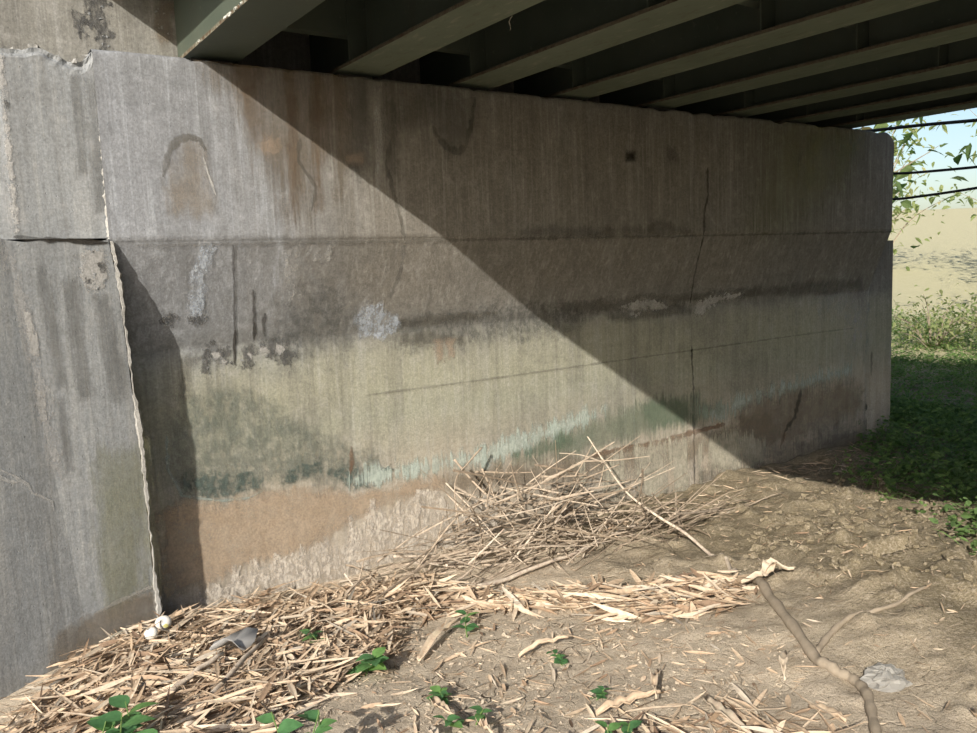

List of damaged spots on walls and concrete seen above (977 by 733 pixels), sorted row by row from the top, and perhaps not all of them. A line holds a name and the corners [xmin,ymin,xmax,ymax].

water stain [187,245,217,316]
crack [230,246,238,364]
water stain [354,304,399,338]
crack [690,167,709,303]
crack [689,347,697,471]
water stain [603,363,852,504]
crack [780,389,801,449]